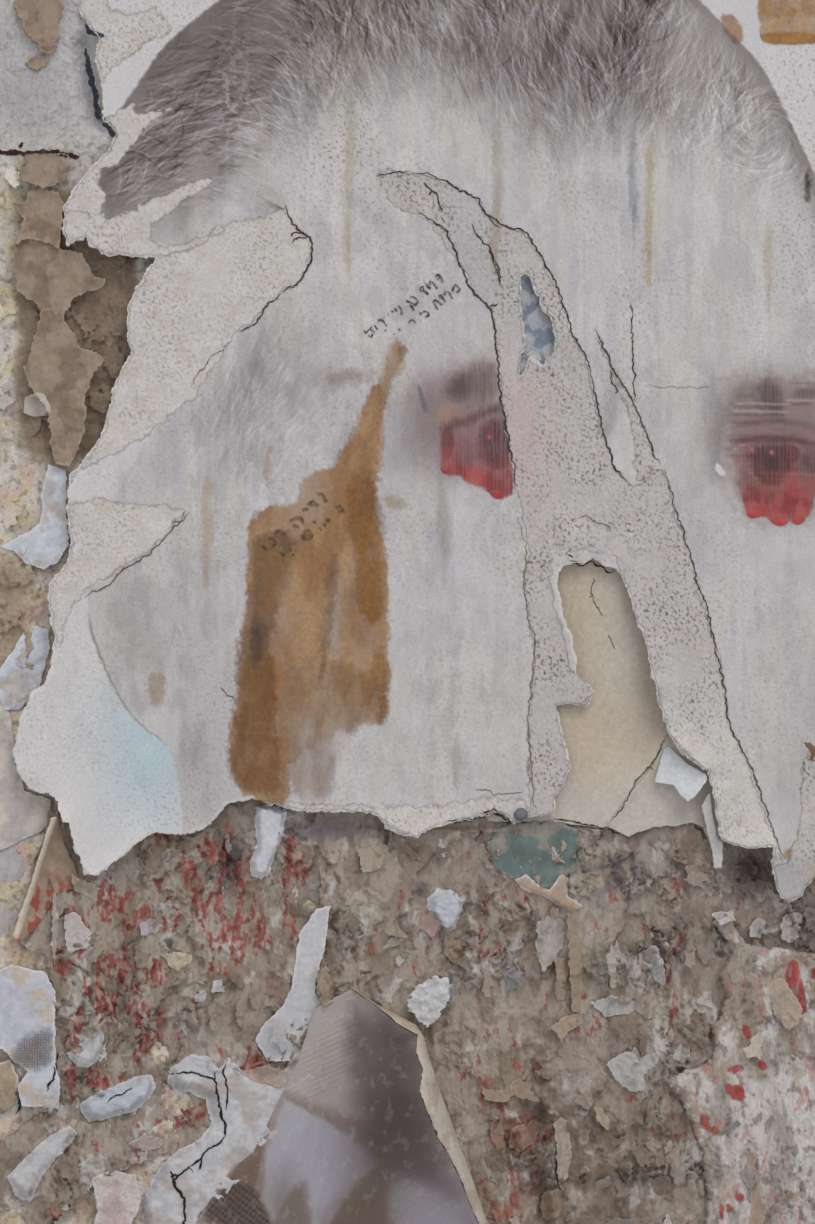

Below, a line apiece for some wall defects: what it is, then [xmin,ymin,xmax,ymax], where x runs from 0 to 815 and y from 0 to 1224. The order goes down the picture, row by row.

peeling [13,0,65,71]
peeling [80,0,172,83]
crack [193,206,313,384]
peeling [50,497,179,647]
peeling [273,168,815,943]
crack [378,171,785,859]
peeling [50,893,92,965]
peeling [124,919,192,972]
peeling [535,907,697,1043]
peeling [767,978,803,1029]
peeling [482,1061,590,1224]
peeling [594,1032,674,1224]